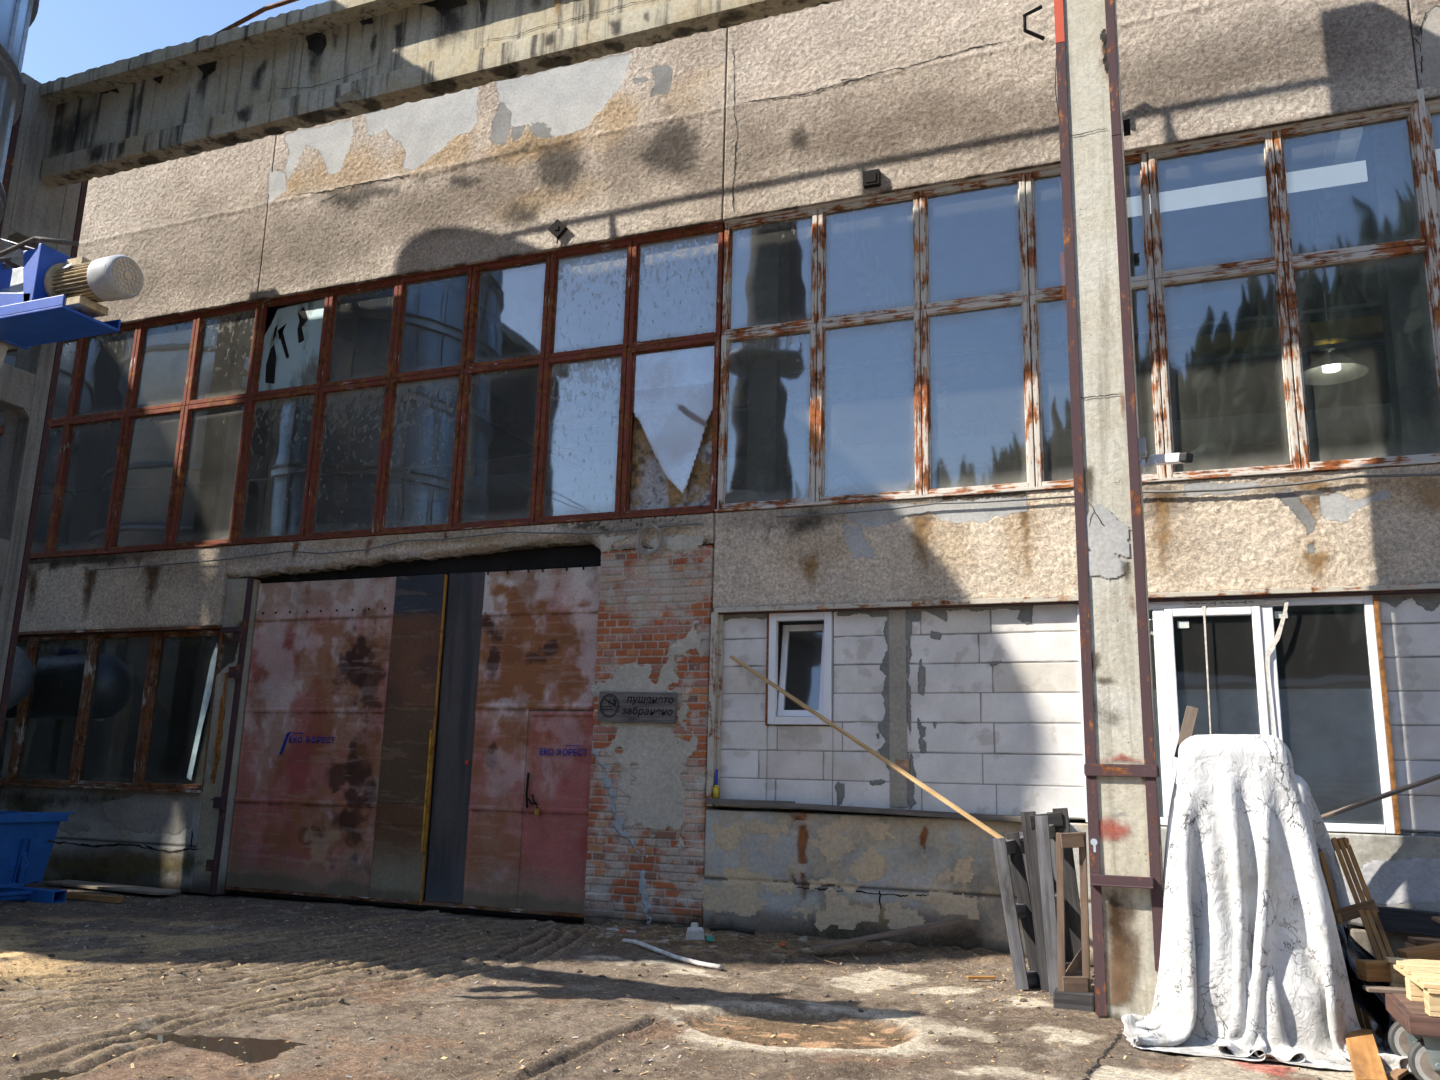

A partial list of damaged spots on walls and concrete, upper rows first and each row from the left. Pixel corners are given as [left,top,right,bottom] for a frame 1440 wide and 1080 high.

damp [185,108,283,152]
damp [300,110,345,123]
damp [425,79,457,94]
flaking render [268,53,673,203]
damp [491,66,518,78]
damp [537,33,572,68]
flaking render [1184,480,1260,497]
flaking render [841,495,1028,559]
flaking render [1275,489,1390,554]
flaking render [590,620,709,851]
corrosion [792,813,808,895]
flaking render [699,815,985,931]